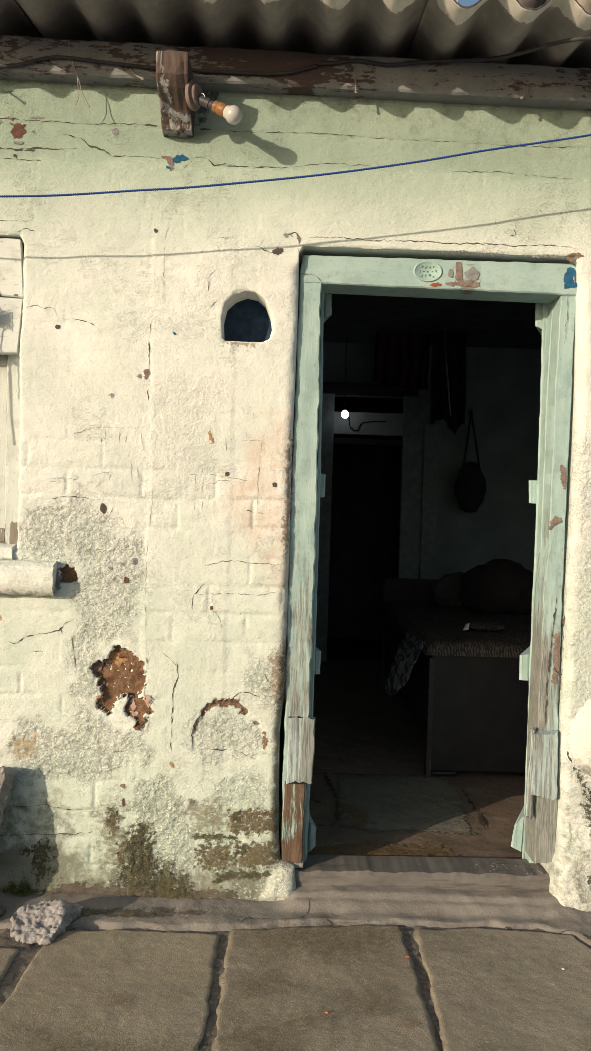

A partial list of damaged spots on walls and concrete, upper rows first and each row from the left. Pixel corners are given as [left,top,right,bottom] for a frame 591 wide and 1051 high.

peeling [0,116,45,145]
crack [0,117,369,169]
flaking render [55,564,77,590]
crack [192,560,279,622]
crack [10,620,76,667]
flaking render [89,645,154,731]
flaking render [191,698,268,749]
damp [42,825,238,918]